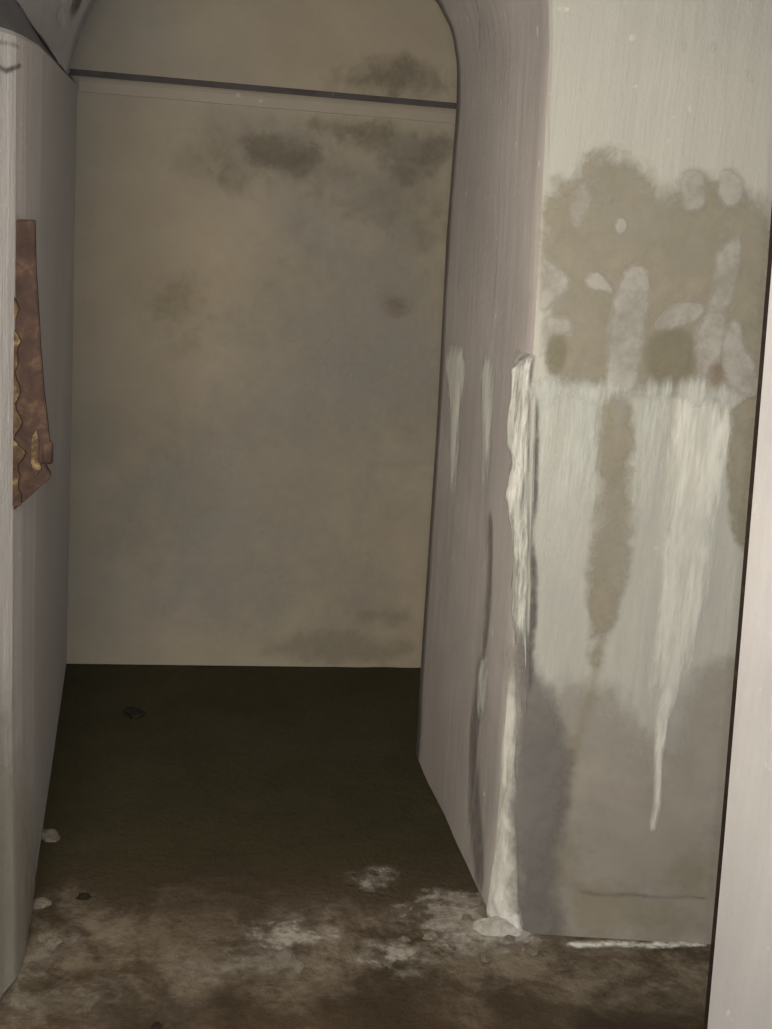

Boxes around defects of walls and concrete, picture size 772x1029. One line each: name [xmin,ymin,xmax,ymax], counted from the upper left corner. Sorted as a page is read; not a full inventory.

peeling [539,153,769,399]
water stain [421,348,757,954]
water stain [368,943,416,963]